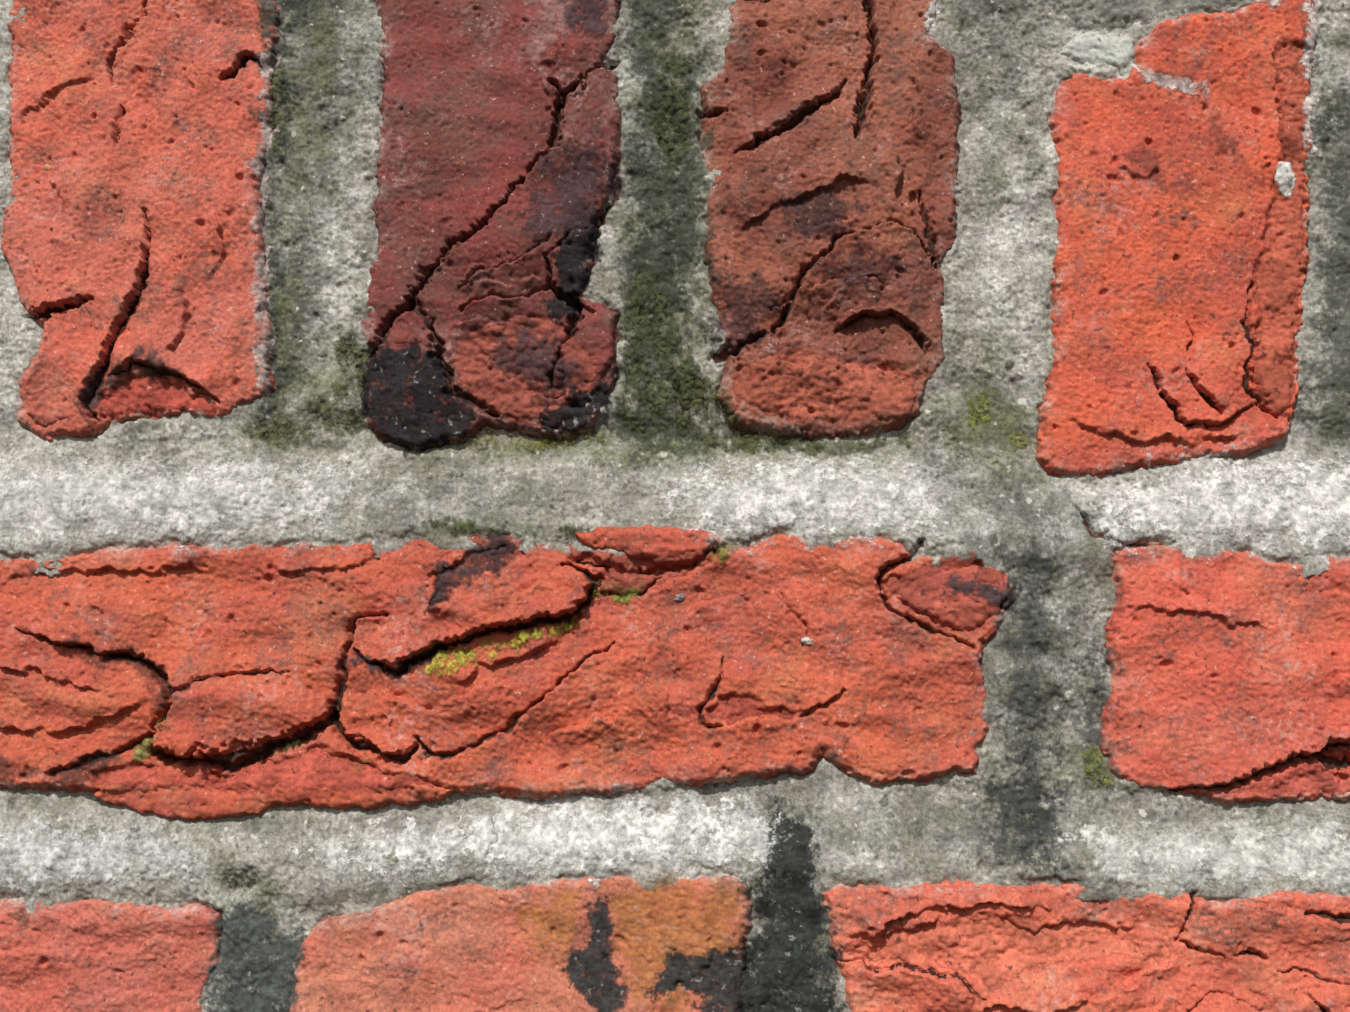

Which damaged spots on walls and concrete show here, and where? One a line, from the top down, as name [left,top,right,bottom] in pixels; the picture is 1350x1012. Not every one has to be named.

crack [227,55,260,79]
crack [752,0,875,149]
crack [26,299,87,319]
crack [84,236,204,419]
damp [606,0,959,550]
crack [1151,286,1259,428]
crack [877,540,961,643]
crack [40,555,643,777]
crack [1168,742,1350,792]
damp [281,788,845,1012]
crack [863,960,978,997]
crack [1179,892,1350,1012]